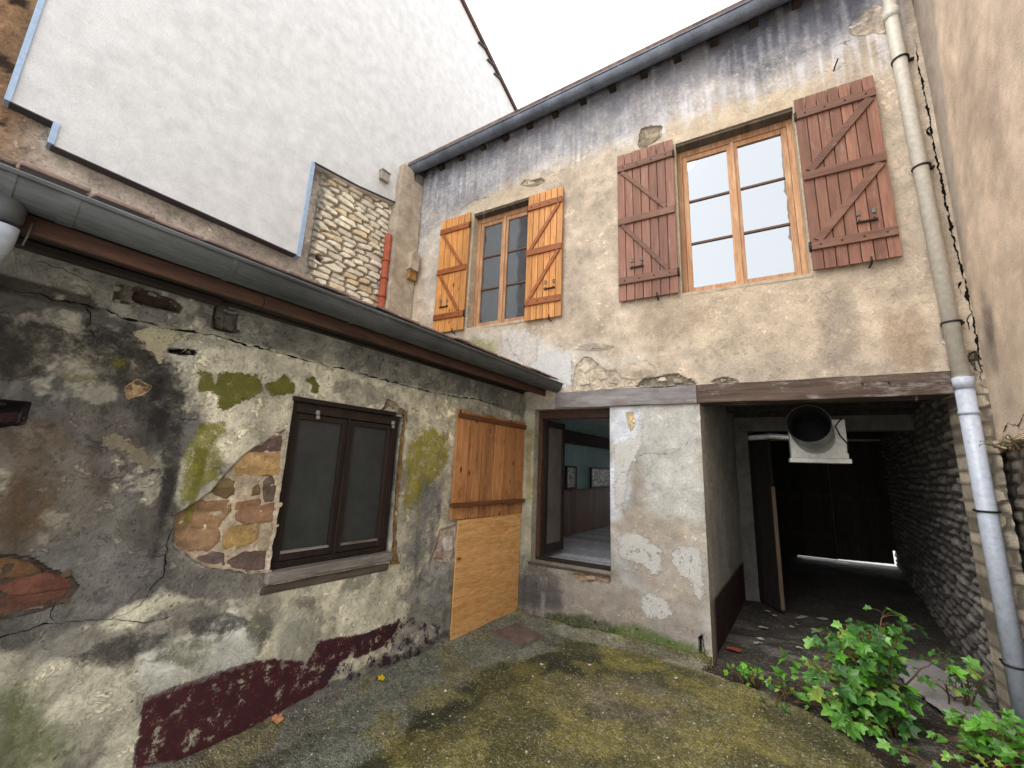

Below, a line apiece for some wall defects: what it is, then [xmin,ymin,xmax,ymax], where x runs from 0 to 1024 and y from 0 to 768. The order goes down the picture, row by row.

flaking render [638,126,662,149]
crack [916,46,984,395]
leakage [0,320,191,525]
crack [0,261,502,407]
flaking render [505,327,697,391]
flaking render [0,554,78,620]
crack [0,504,176,638]
flaking render [172,430,286,574]
peeling [638,592,674,620]
peeling [615,530,705,601]
peeling [132,617,451,768]